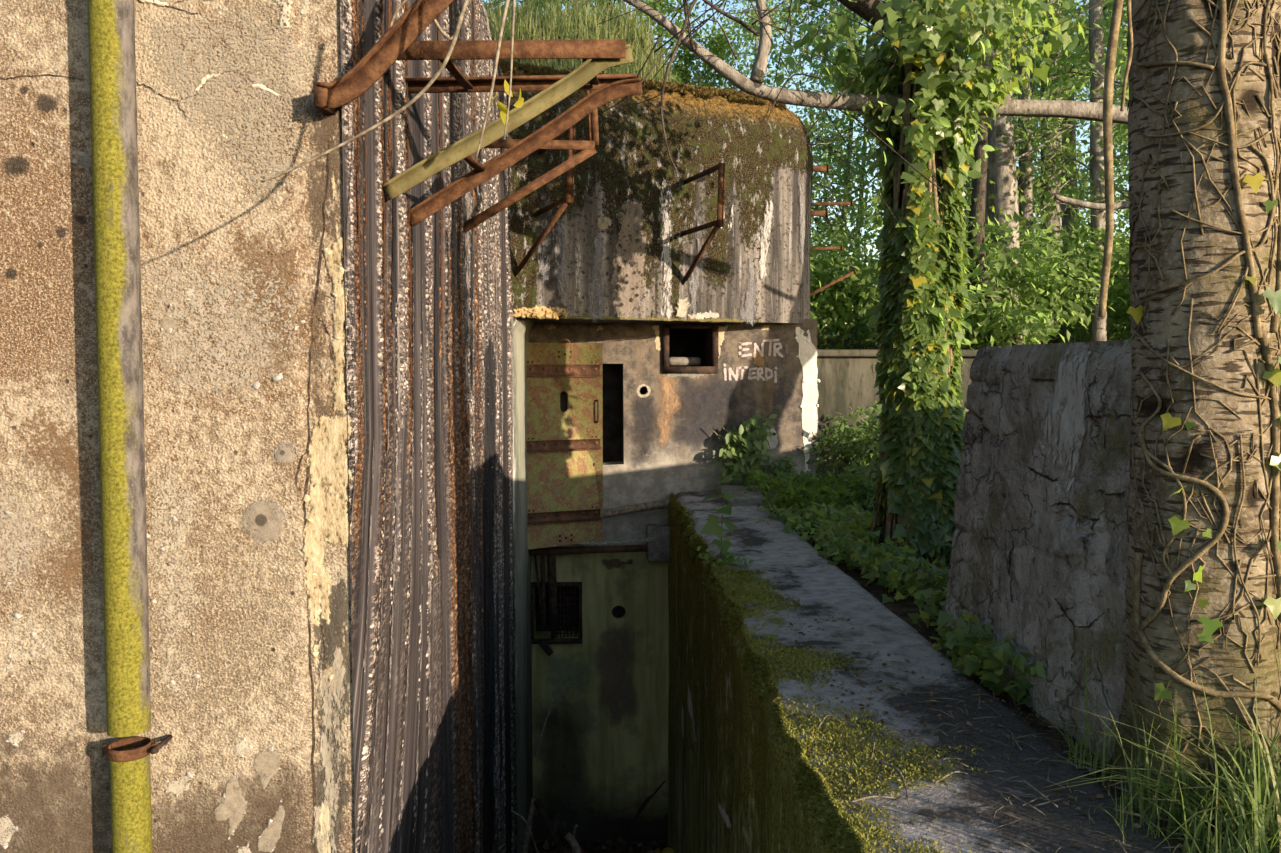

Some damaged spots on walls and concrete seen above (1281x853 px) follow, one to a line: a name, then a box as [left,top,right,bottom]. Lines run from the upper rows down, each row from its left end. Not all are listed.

crack [139,0,213,16]
peeling [302,223,352,626]
peeling [794,327,820,473]
water stain [463,180,774,853]
peeling [311,645,338,688]
spalling [0,815,19,850]
spalling [214,737,285,853]